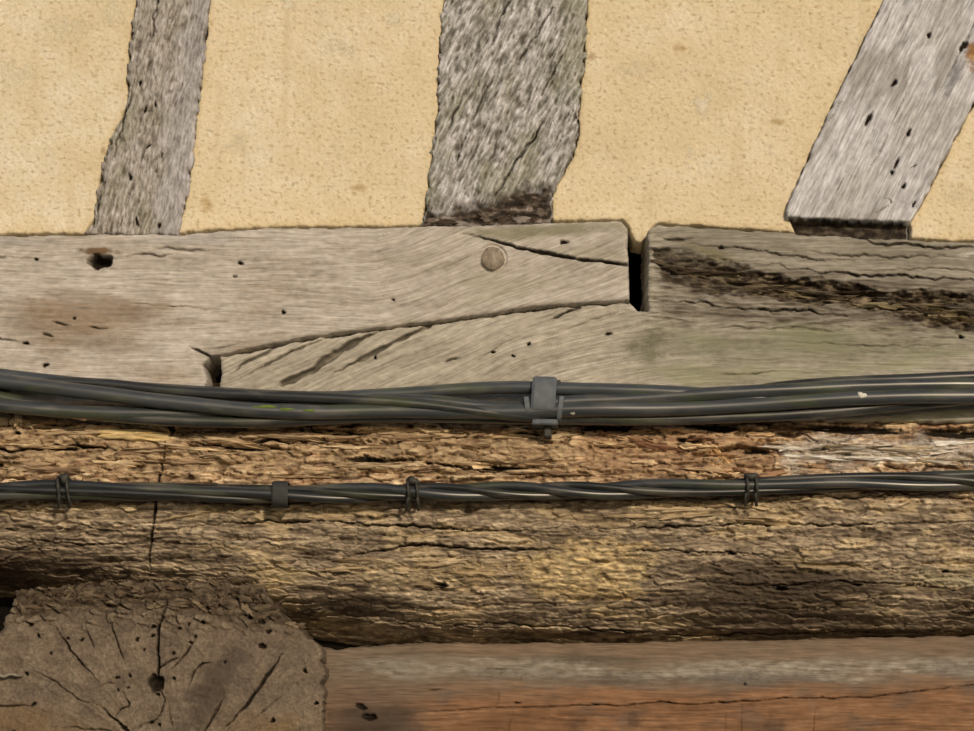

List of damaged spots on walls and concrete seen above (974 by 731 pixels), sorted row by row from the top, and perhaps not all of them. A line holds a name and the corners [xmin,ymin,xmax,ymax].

crack [465,234,627,266]
crack [733,238,974,281]
crack [553,308,615,327]
crack [192,330,415,384]
crack [344,458,554,478]
crack [0,425,321,575]
crack [184,494,974,560]
crack [51,607,206,731]
crack [205,654,283,731]